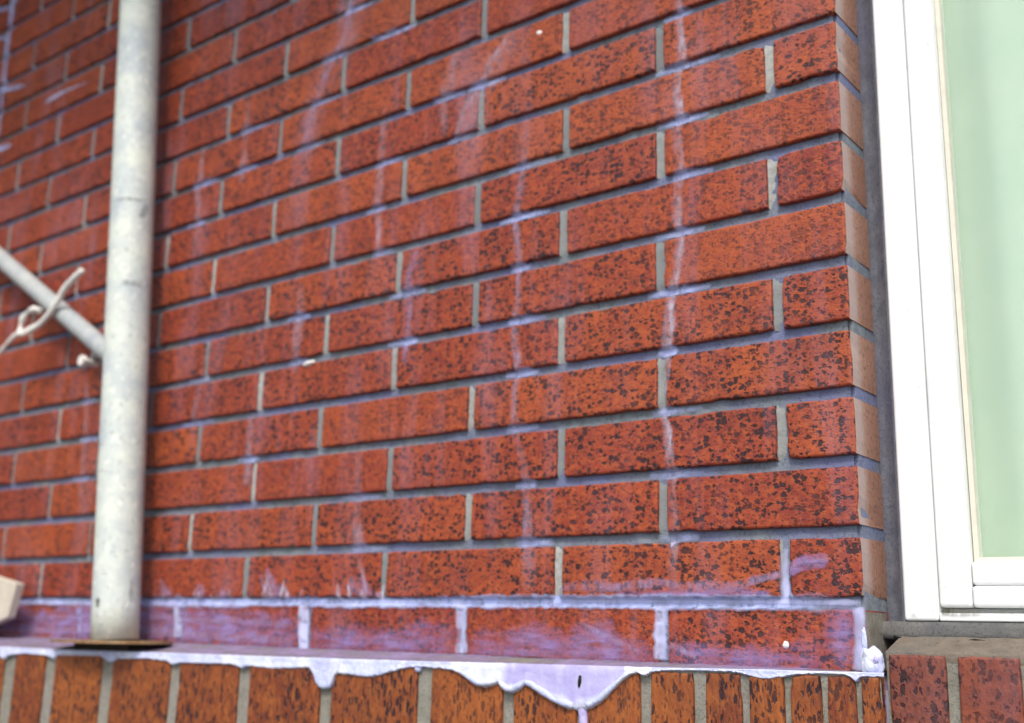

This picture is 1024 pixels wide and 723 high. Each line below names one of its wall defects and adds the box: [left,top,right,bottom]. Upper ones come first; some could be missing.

water stain [670,99,699,126]
water stain [505,212,541,223]
water stain [653,286,699,310]
water stain [659,346,677,358]
water stain [509,369,535,377]
water stain [0,557,885,723]